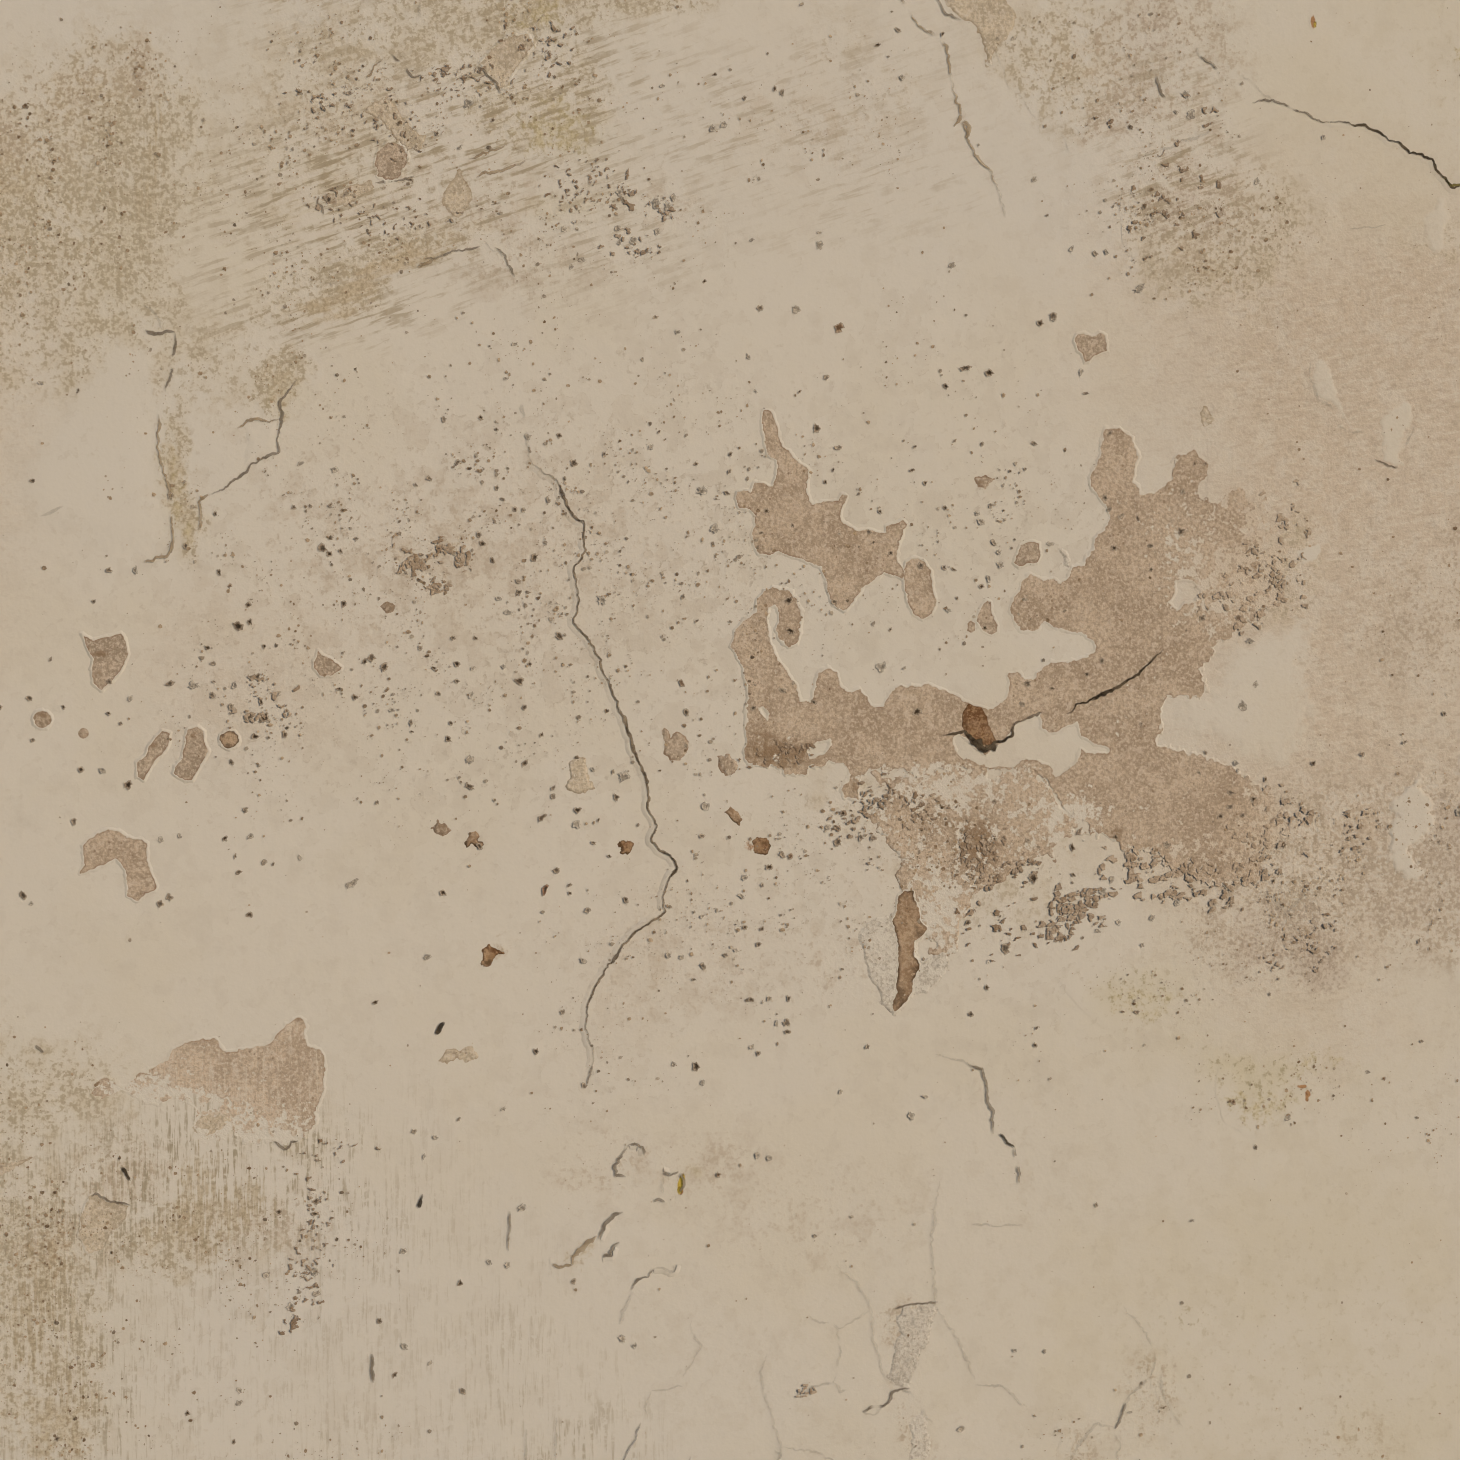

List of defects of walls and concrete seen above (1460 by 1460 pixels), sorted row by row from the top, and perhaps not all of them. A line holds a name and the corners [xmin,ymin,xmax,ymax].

crack [912,0,990,169]
crack [1260,99,1460,194]
peeling [697,390,958,622]
peeling [78,630,131,693]
peeling [124,646,300,790]
peeling [311,648,358,700]
spalling [363,654,388,672]
crack [525,460,678,1084]
peeling [717,424,1437,1016]
peeling [71,818,182,908]
peeling [89,1015,357,1335]